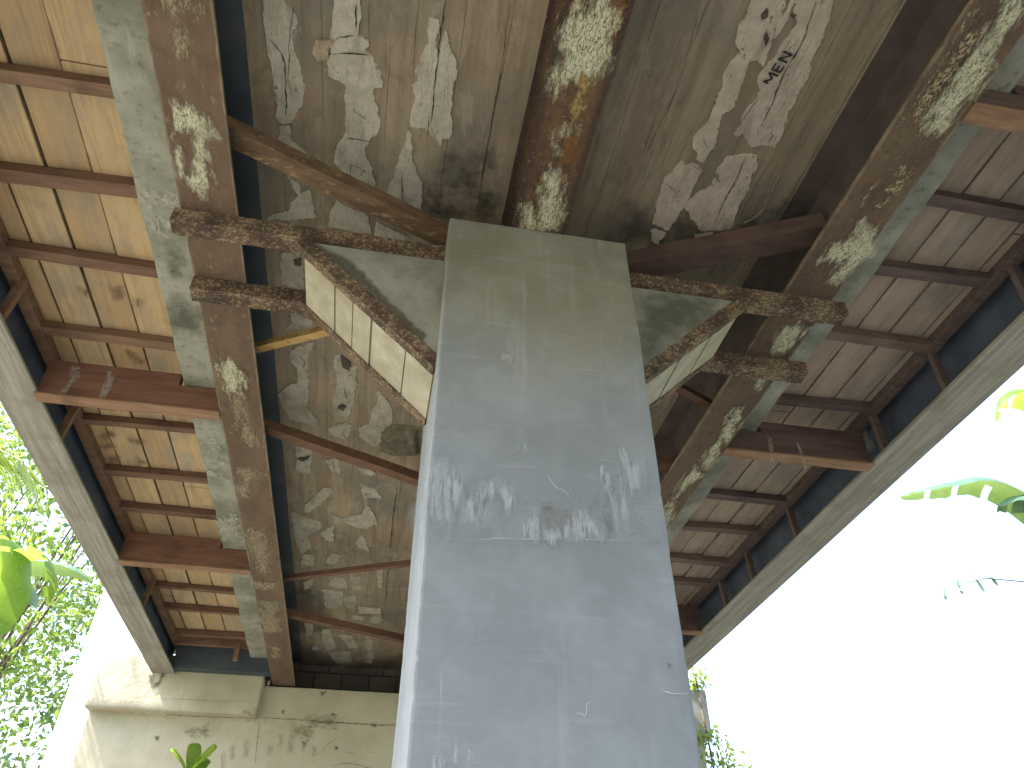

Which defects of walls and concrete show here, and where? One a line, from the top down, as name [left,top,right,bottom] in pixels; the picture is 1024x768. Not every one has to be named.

efflorescence [172,100,219,198]
peeling [262,0,308,155]
peeling [312,0,458,210]
corrosion [570,75,592,119]
peeling [651,0,833,245]
efflorescence [921,0,1024,135]
peeling [328,199,408,240]
efflorescence [817,217,877,285]
efflorescence [215,358,257,446]
peeling [278,341,393,447]
peeling [291,467,384,624]
damp [544,448,646,544]